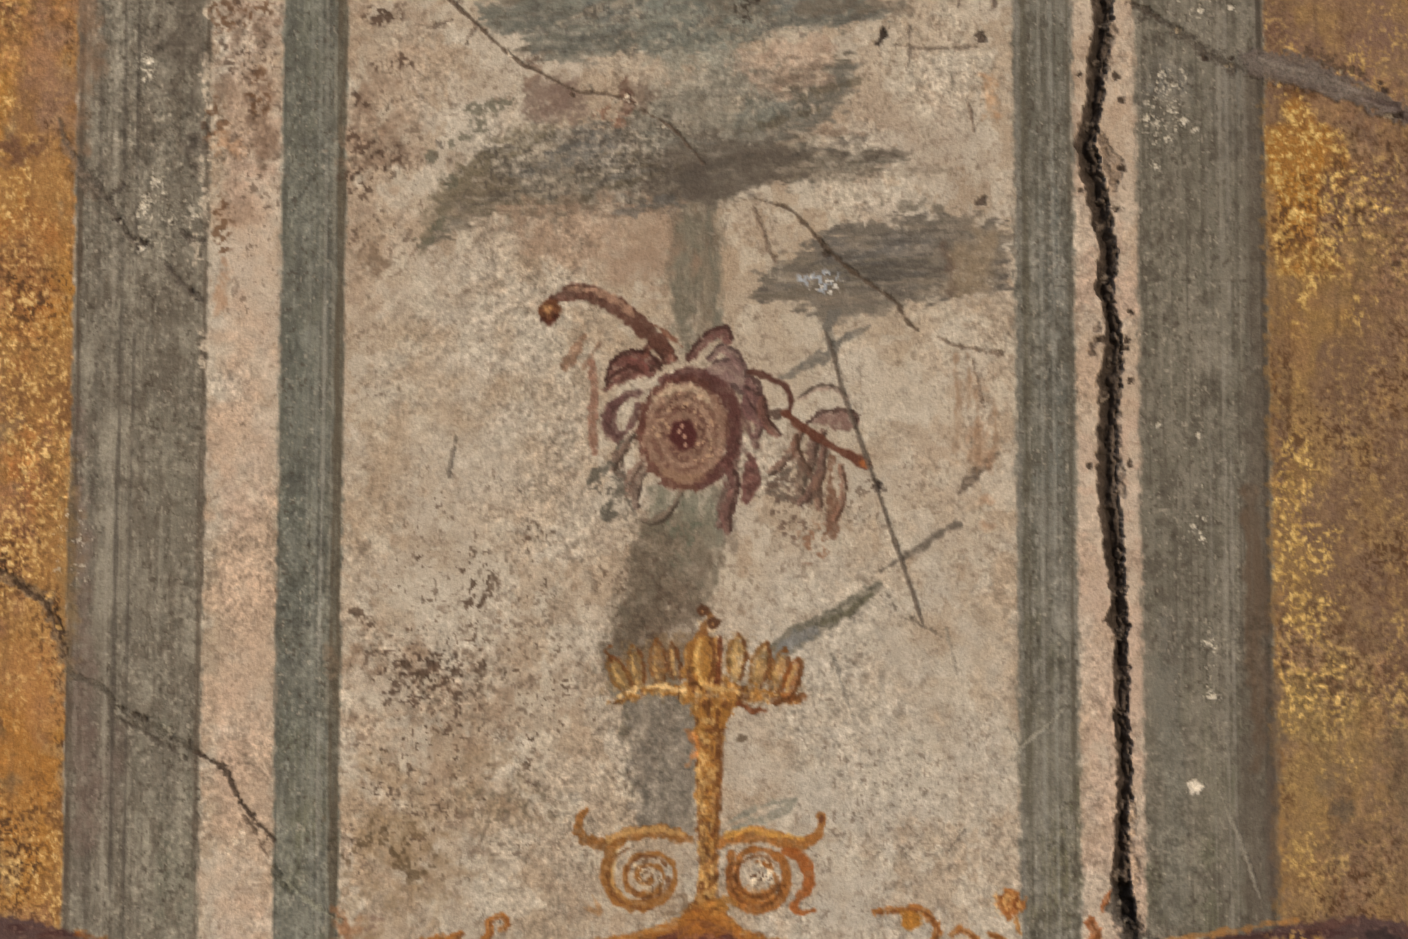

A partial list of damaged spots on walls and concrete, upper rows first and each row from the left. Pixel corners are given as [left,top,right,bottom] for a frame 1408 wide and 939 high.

crack [426,0,706,167]
crack [752,196,1005,410]
crack [1073,0,1408,939]
crack [0,555,344,926]